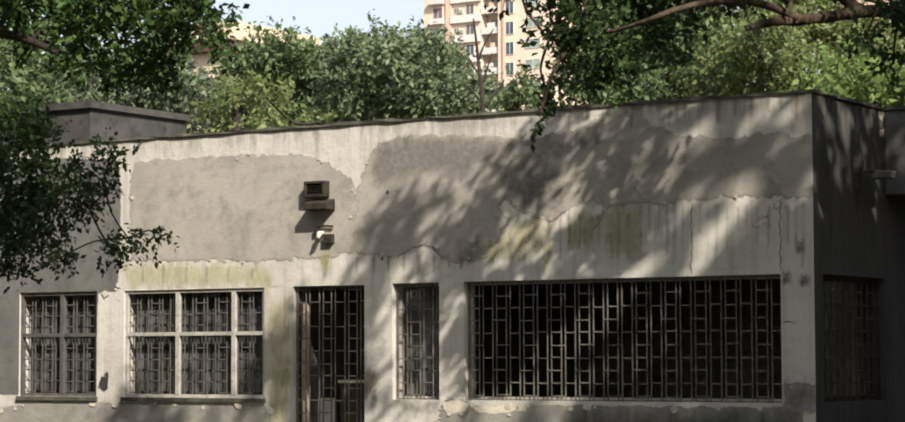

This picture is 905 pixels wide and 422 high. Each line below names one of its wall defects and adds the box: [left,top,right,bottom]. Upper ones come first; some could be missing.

peeling [0,112,816,422]
crack [688,203,696,274]